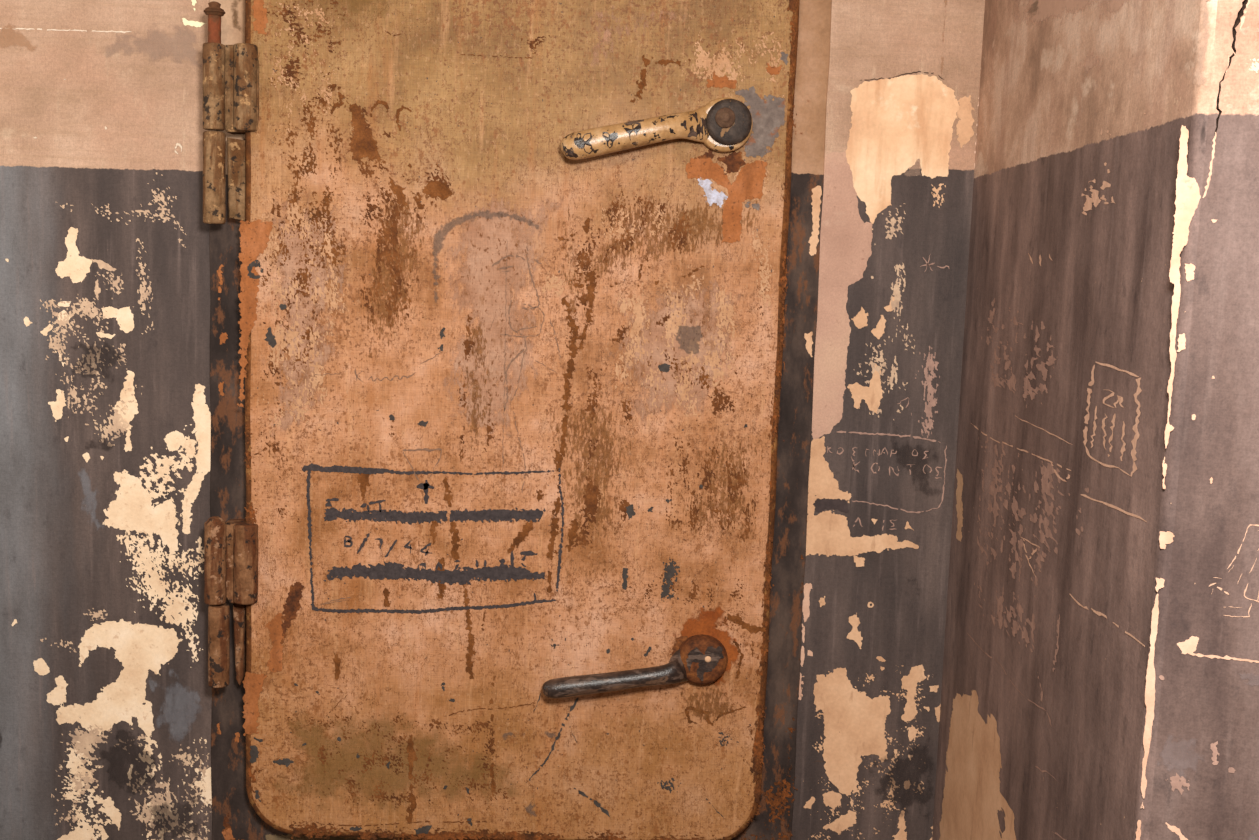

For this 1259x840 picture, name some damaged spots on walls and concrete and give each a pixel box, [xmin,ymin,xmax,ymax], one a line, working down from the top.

crack [1203,0,1250,198]
peeling [91,163,186,248]
rust [220,0,454,411]
peeling [1185,263,1195,282]
rust [457,312,496,460]
rust [536,157,767,593]
rust [578,0,802,840]
peeling [24,227,263,840]
peeling [1159,531,1174,549]
rust [243,581,304,736]
peeling [1177,636,1199,655]
rust [279,676,563,840]